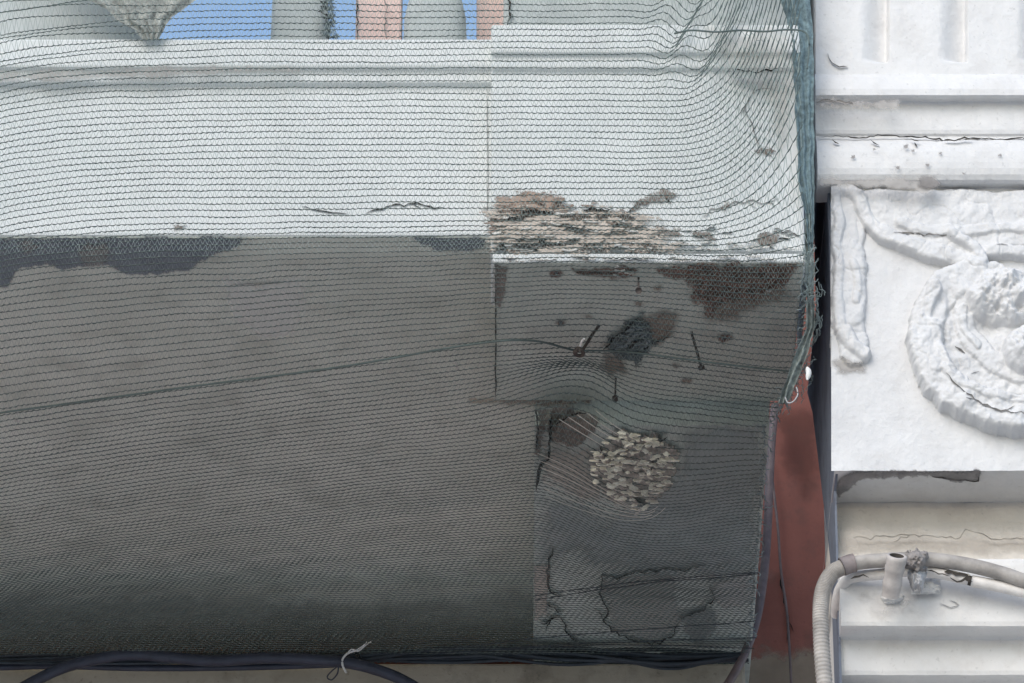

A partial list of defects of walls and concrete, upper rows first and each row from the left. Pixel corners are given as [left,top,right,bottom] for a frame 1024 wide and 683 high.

crack [825,134,1024,146]
crack [303,202,441,214]
peeling [479,189,798,322]
spalling [601,312,677,374]
peeling [534,405,681,516]
crack [857,529,1024,541]
crack [542,550,580,643]
crack [599,566,715,648]